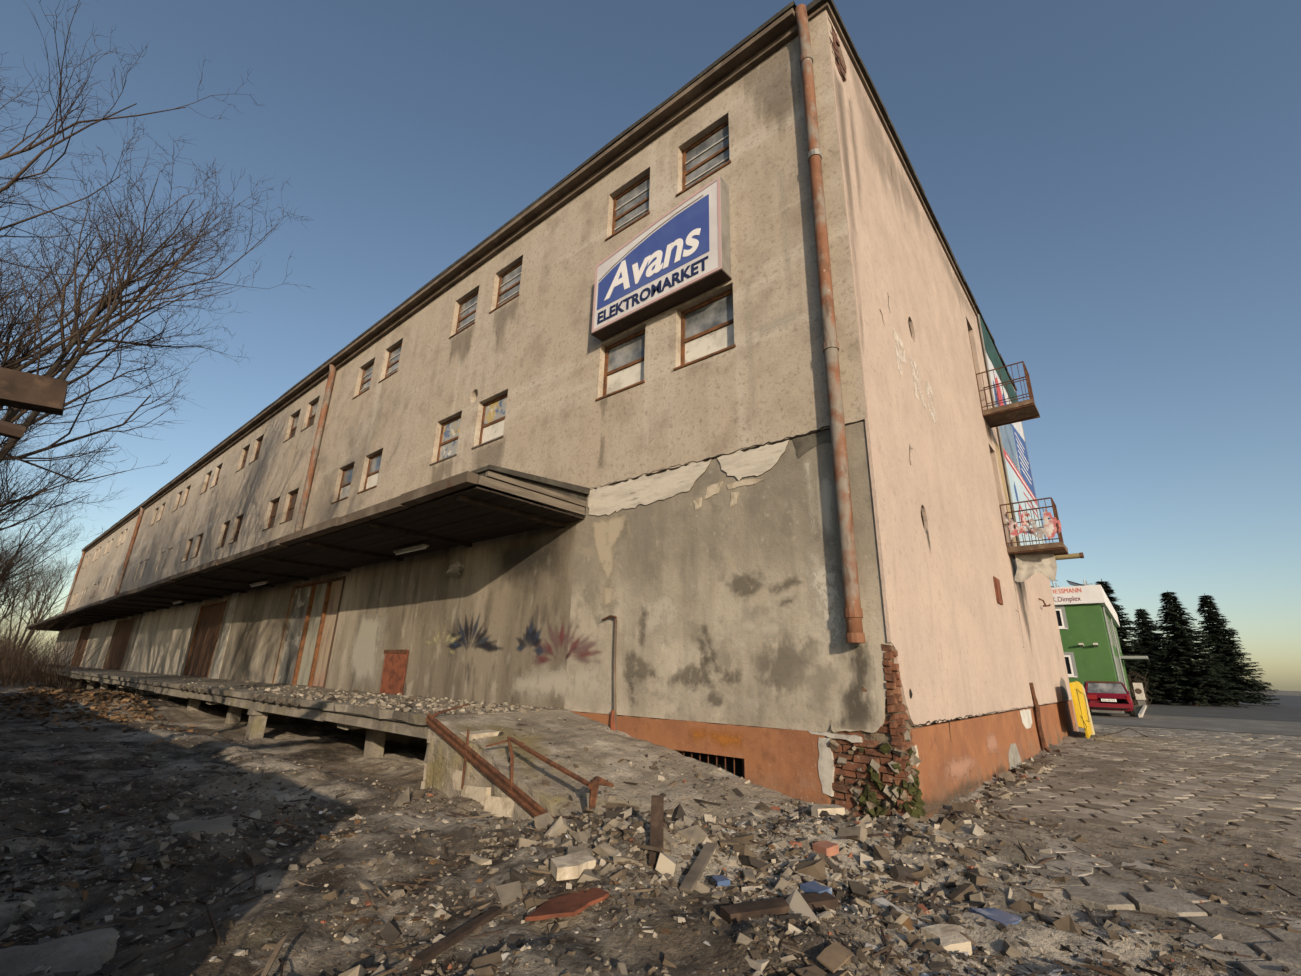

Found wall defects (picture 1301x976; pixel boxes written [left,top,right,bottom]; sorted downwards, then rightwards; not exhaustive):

spalling [829,30,846,82]
peeling [588,430,831,606]
water stain [732,553,844,648]
water stain [514,665,608,701]
water stain [626,595,684,702]
water stain [673,627,757,706]
water stain [741,618,800,686]
water stain [842,645,868,724]
spalling [807,644,927,819]
spalling [1020,709,1032,729]